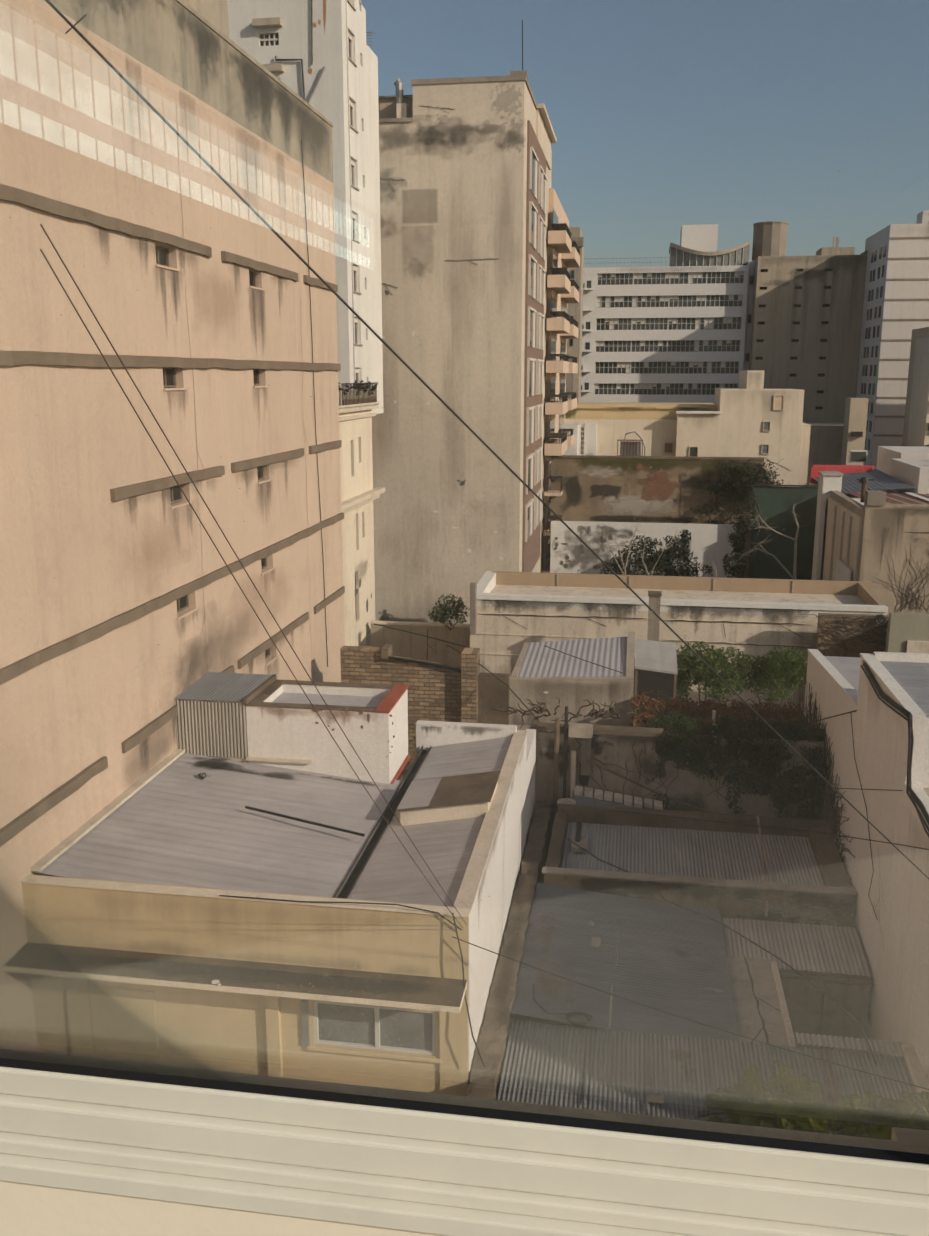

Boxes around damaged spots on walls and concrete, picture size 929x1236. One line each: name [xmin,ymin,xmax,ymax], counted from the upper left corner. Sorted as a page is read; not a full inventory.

water stain [242,61,326,152]
water stain [565,461,661,507]
water stain [567,515,699,569]